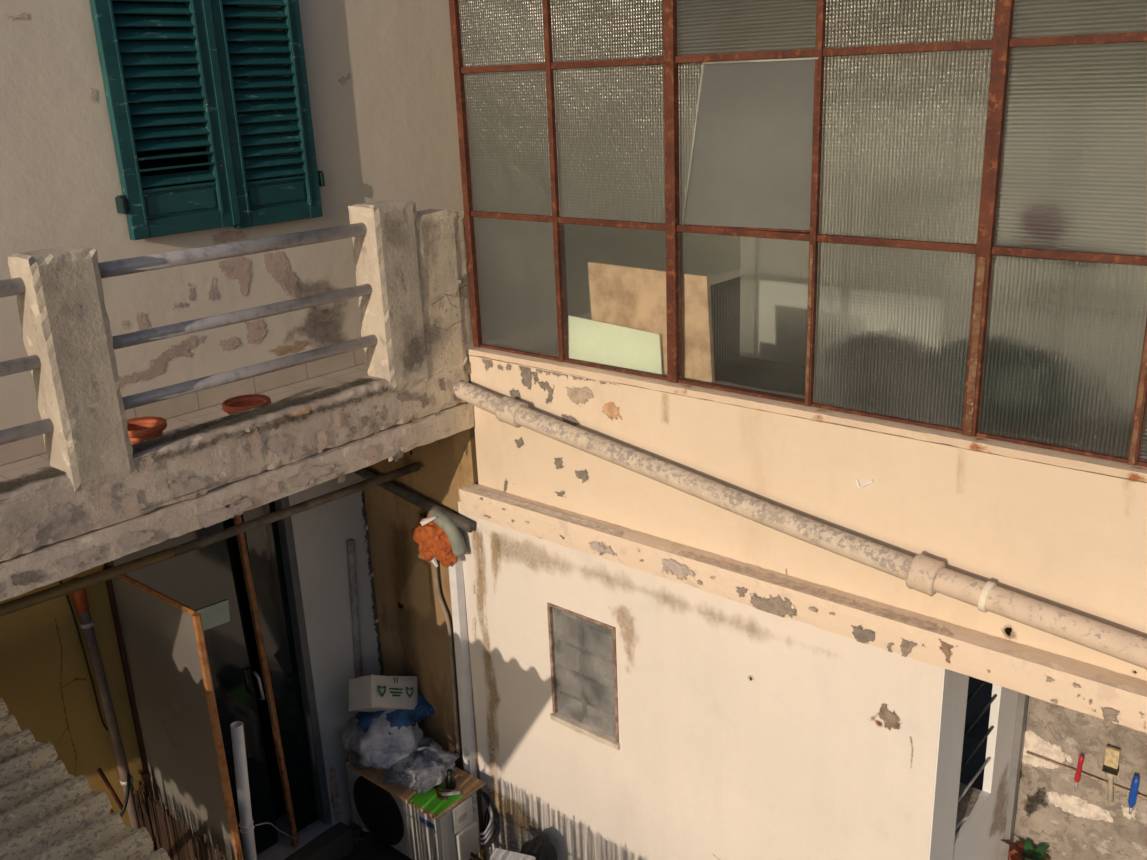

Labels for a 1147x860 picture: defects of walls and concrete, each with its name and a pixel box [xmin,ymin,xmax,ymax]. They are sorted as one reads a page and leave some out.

peeling [120,335,205,389]
peeling [397,390,441,425]
peeling [464,359,622,426]
peeling [141,455,208,504]
peeling [192,497,252,528]
peeling [11,571,45,586]
peeling [662,552,957,663]